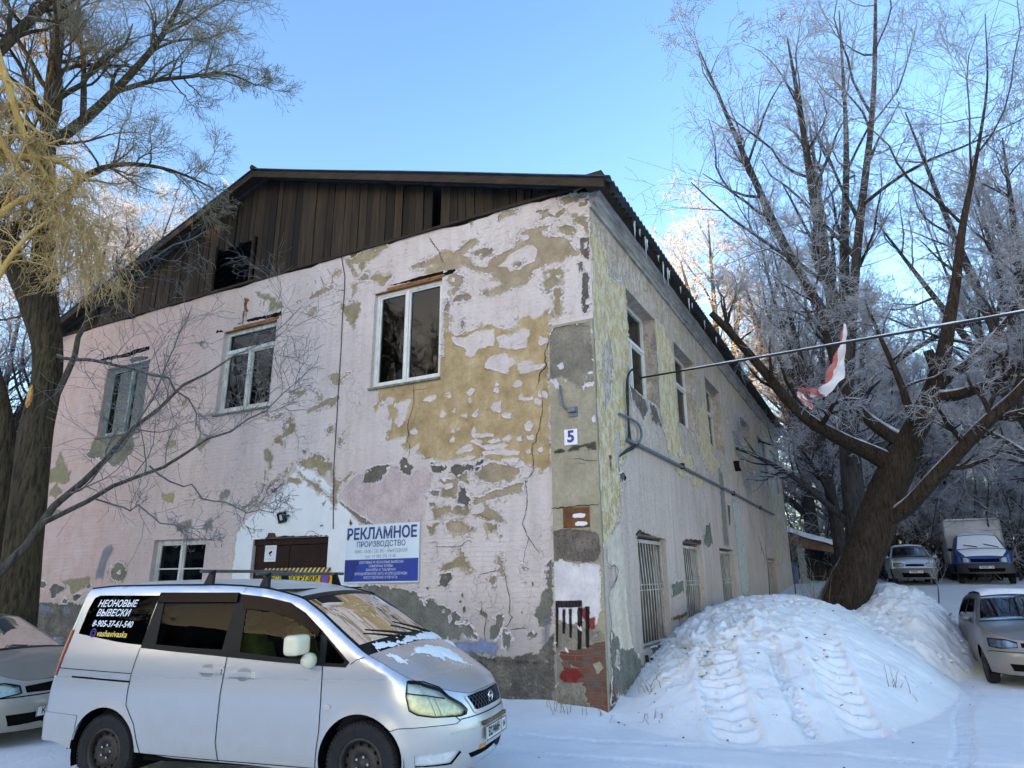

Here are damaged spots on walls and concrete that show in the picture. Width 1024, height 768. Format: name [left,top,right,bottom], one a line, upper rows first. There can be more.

peeling [110,559,127,584]
peeling [238,192,741,550]
spalling [361,548,663,713]
crack [478,322,587,659]